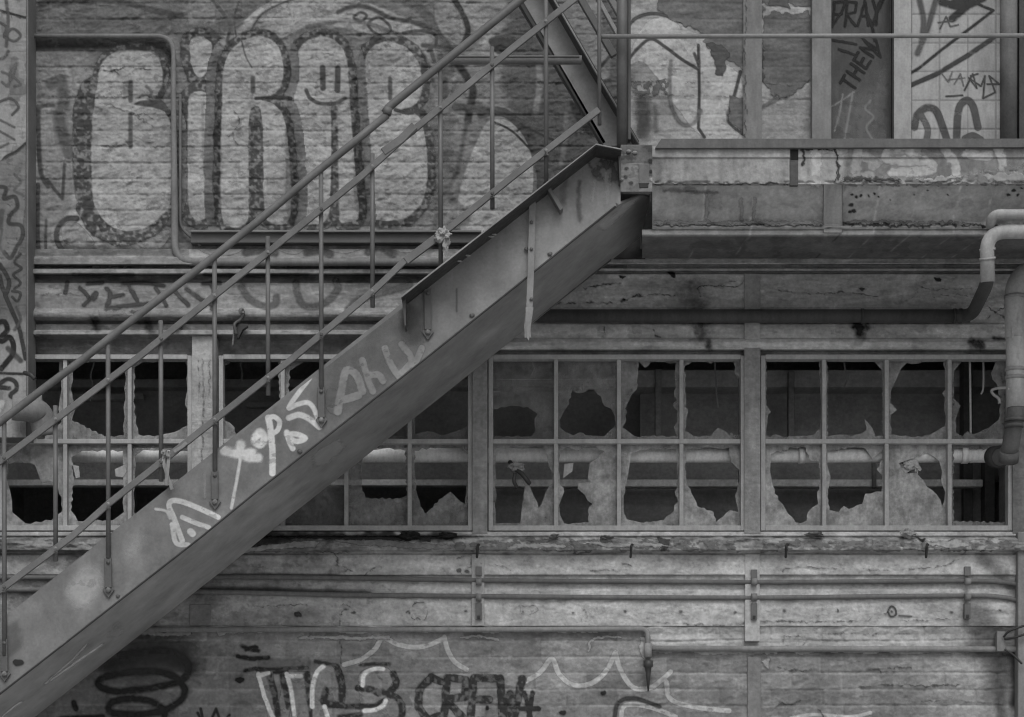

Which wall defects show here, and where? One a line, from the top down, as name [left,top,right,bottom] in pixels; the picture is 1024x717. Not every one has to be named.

crack [800,149,841,182]
peeling [245,535,736,553]
peeling [761,537,1016,553]